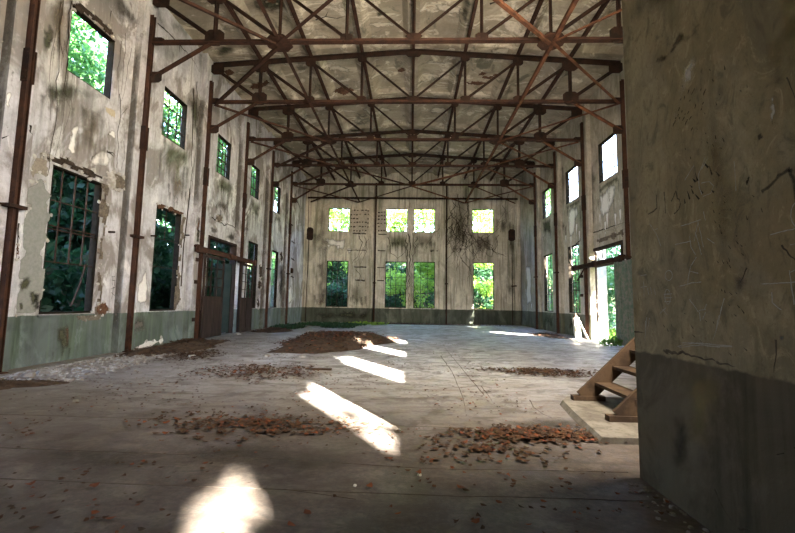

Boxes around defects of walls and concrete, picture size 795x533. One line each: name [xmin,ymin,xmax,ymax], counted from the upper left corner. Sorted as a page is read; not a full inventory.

mould [49,86,74,100]
flaking render [15,152,126,317]
flaking render [77,301,111,322]
peeling [136,336,163,348]
crack [663,349,736,367]